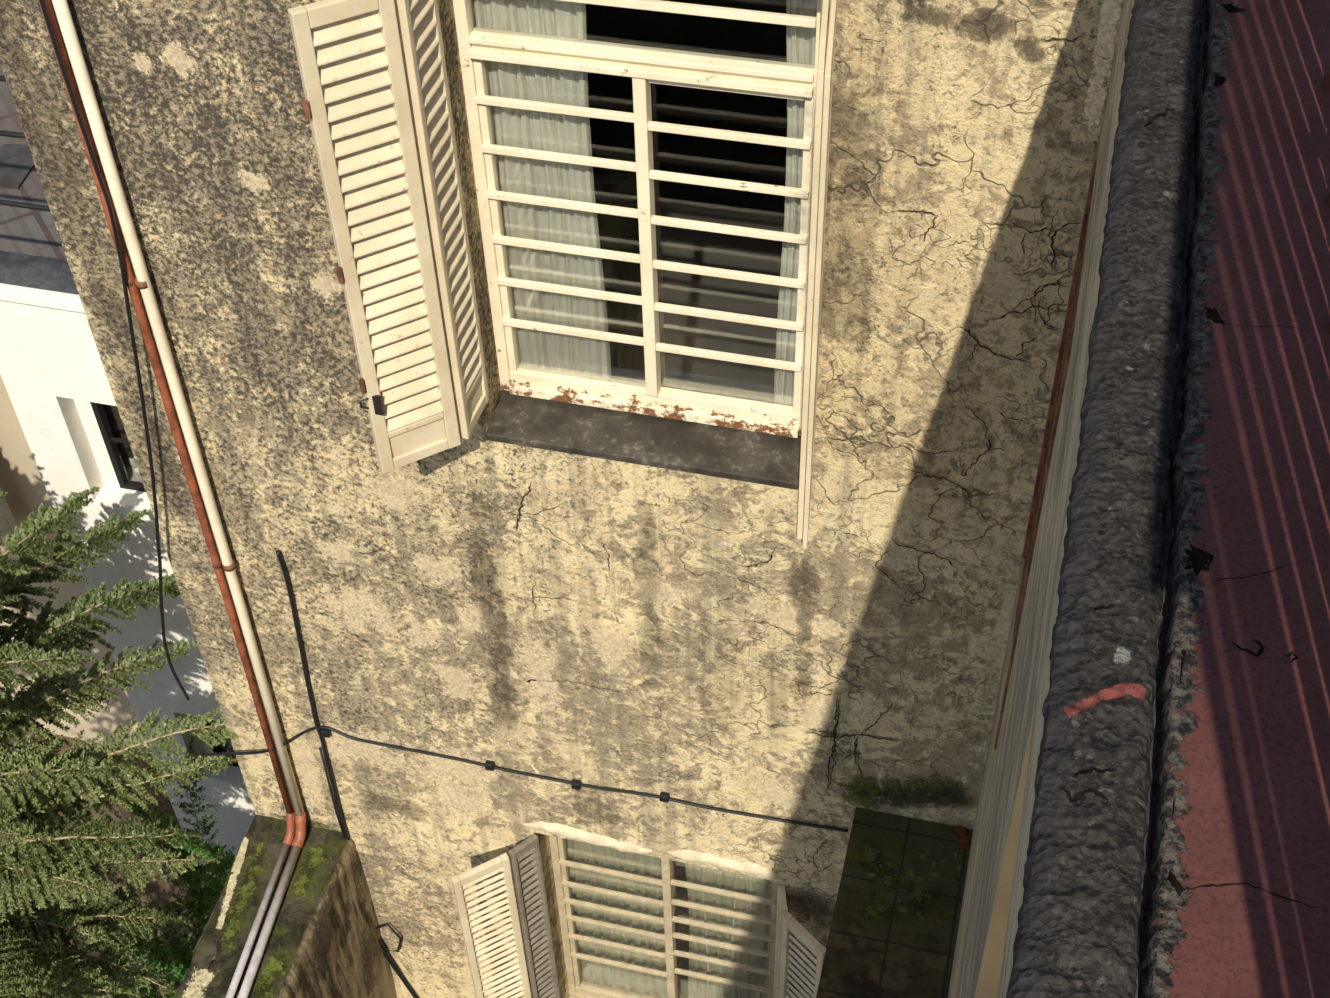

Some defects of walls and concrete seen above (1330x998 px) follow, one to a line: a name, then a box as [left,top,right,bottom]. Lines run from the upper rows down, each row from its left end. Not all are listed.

crack [1042,36,1112,59]
crack [898,210,937,242]
crack [960,221,1082,362]
crack [902,395,1024,498]
crack [806,692,906,796]
leakage [312,859,338,989]
leakage [361,919,376,998]
crack [1184,882,1323,909]